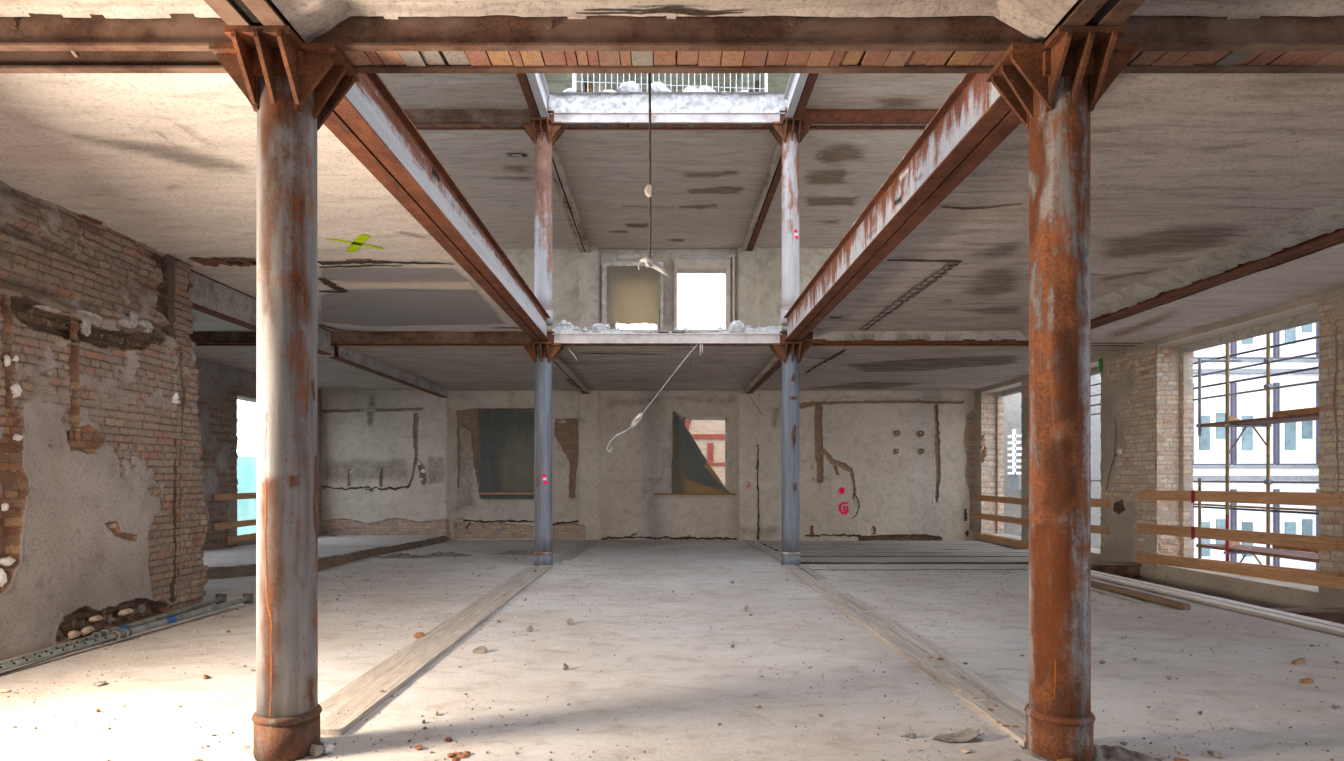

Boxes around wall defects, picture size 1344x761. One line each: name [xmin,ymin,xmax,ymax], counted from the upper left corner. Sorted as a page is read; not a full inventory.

peeling [10,383,22,398]
spalling [65,424,107,454]
spalling [456,408,479,489]
spalling [554,418,586,499]
spalling [105,521,138,541]
peeling [0,557,16,587]
rust [261,412,295,717]
spalling [56,598,174,642]
rust [1030,525,1070,698]